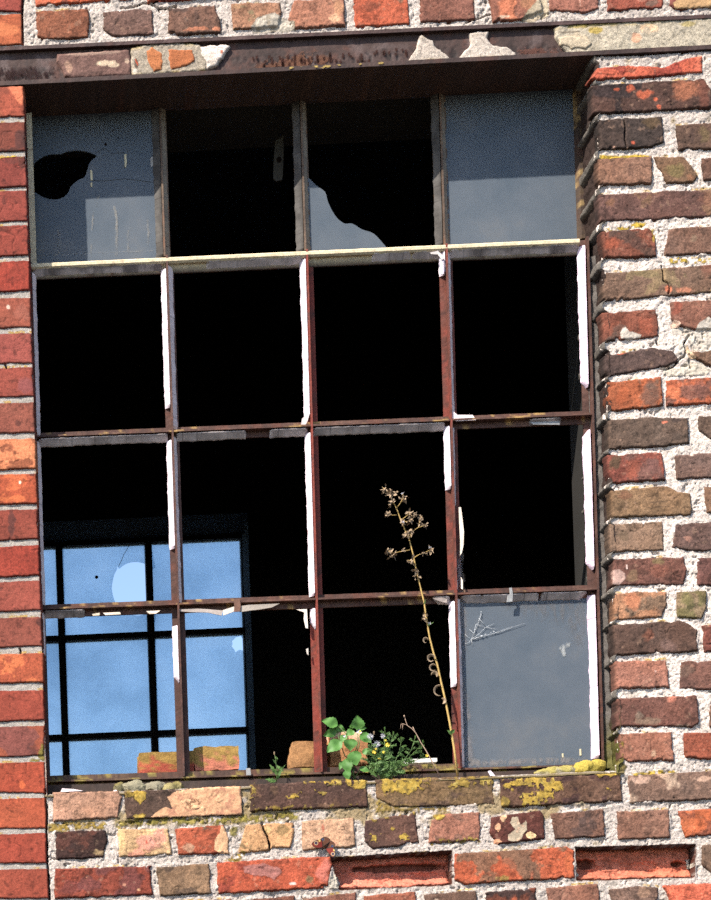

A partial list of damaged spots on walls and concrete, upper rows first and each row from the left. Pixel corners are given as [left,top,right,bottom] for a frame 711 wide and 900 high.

rust [0,66,56,81]
spalling [135,47,195,72]
rust [252,48,408,68]
damp [448,776,563,807]
damp [371,778,450,840]
spalling [493,815,536,845]